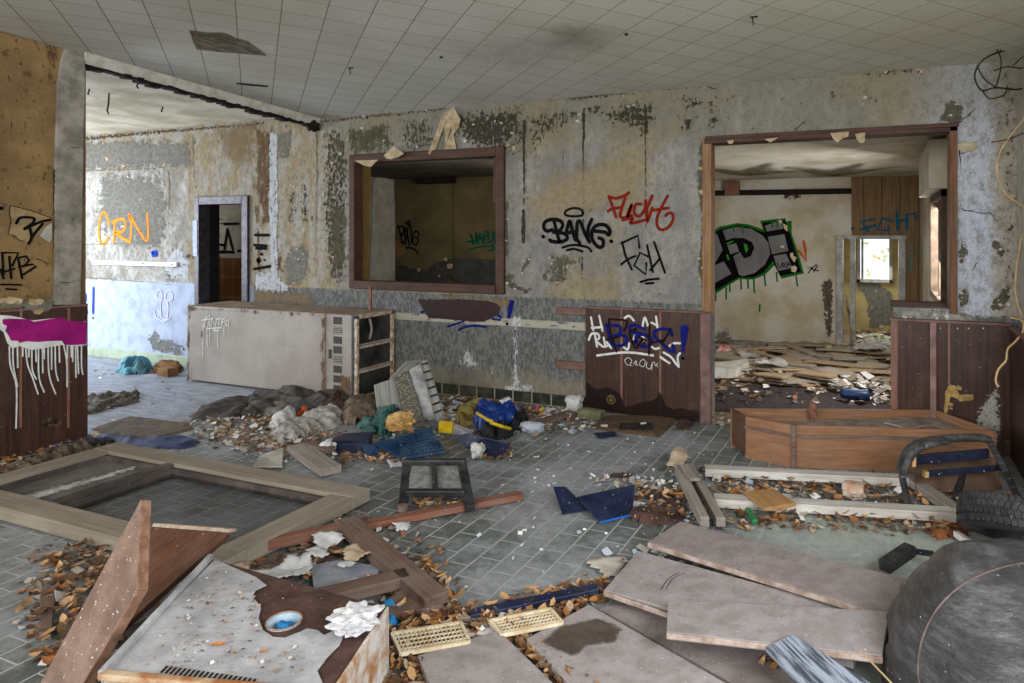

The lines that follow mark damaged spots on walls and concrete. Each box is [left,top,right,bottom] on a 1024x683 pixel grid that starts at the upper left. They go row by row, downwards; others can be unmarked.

peeling [939,100,963,123]
water stain [715,164,885,177]
flaking render [86,122,308,294]
peeling [329,200,349,287]
peeling [991,237,1005,257]
flaking render [821,276,835,340]
flaking render [857,282,973,328]
peeling [990,285,1011,312]